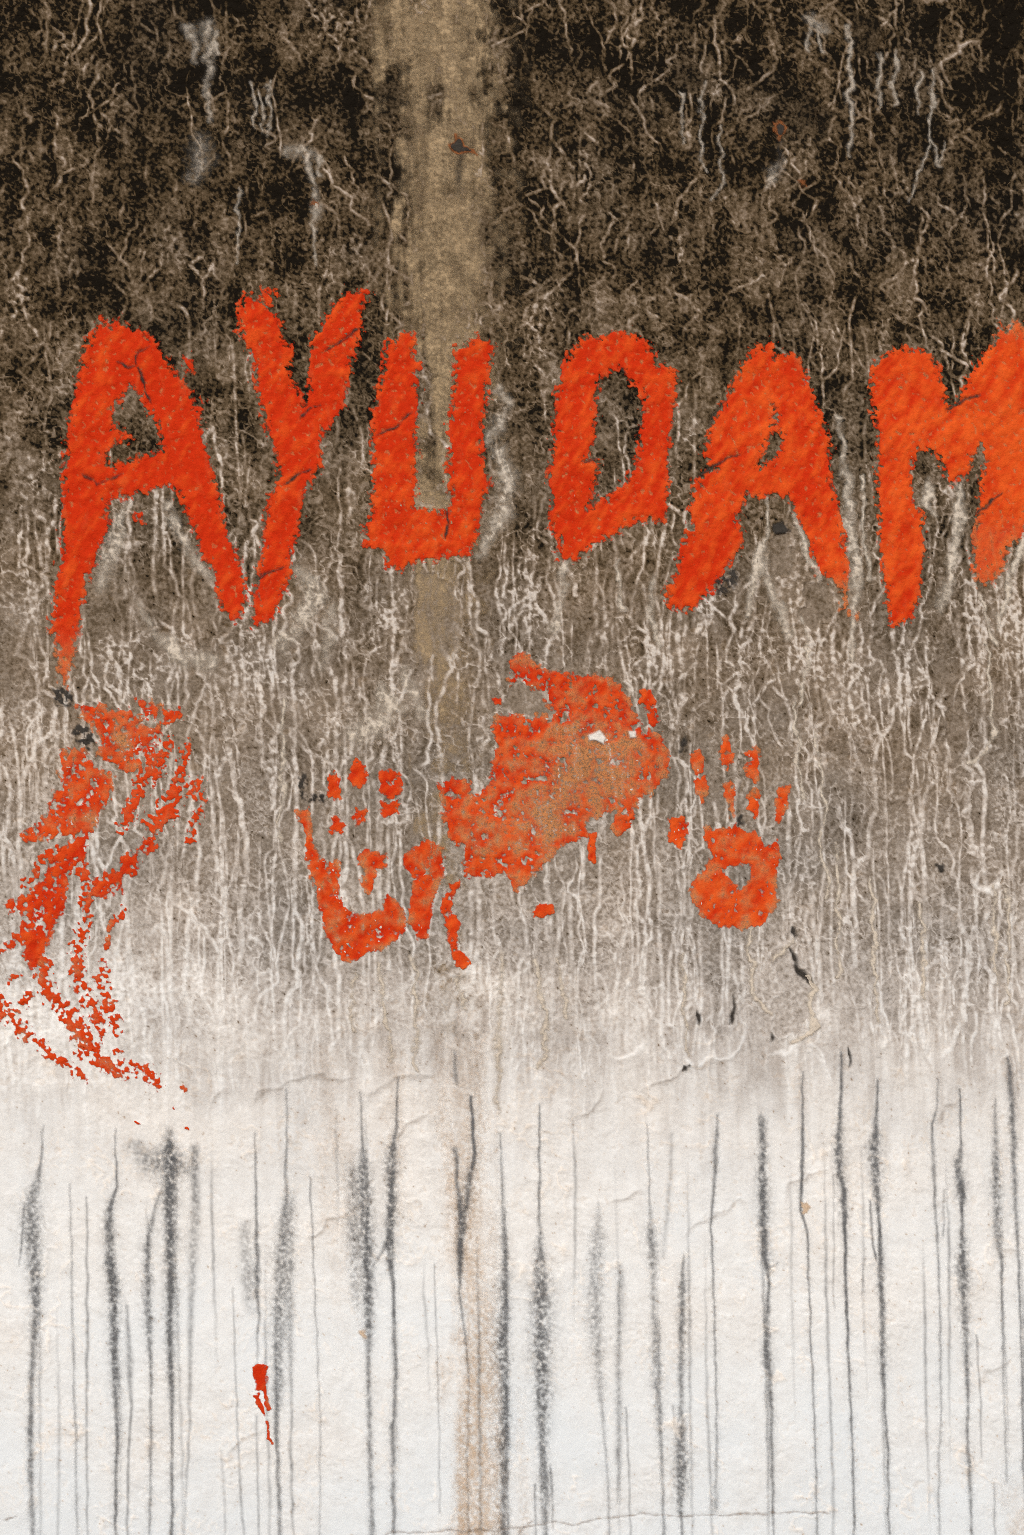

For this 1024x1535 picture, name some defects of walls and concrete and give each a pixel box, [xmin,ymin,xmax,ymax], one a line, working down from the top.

efflorescence [481,386,514,554]
leakage [746,497,843,979]
leakage [835,415,871,663]
efflorescence [939,484,967,610]
efflorescence [966,532,1024,765]
leakage [106,1171,118,1522]
leakage [166,1139,175,1439]
leakage [361,1122,397,1339]
leakage [455,1096,476,1264]
leakage [760,1124,770,1313]
leakage [836,1053,850,1388]
leakage [956,1143,966,1296]